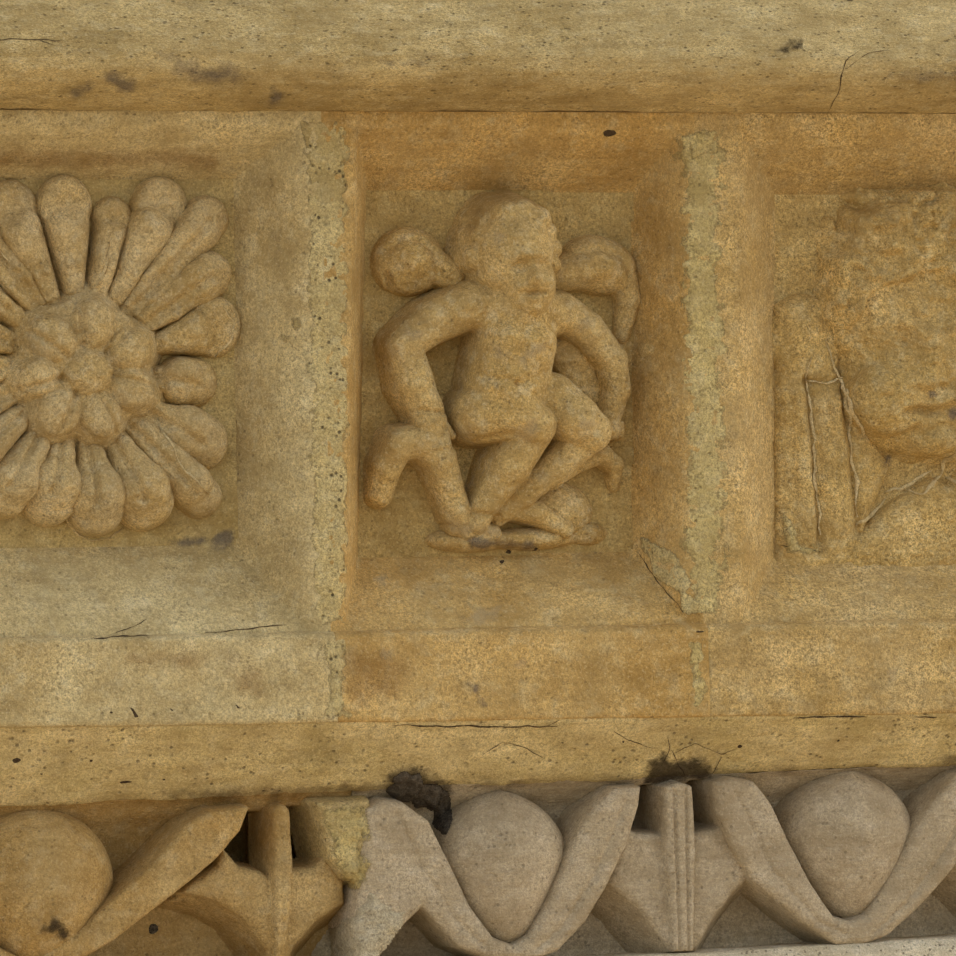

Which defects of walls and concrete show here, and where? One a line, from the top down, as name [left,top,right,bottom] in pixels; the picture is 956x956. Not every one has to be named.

crack [828,50,884,112]
crack [394,720,559,757]
crack [615,732,737,776]